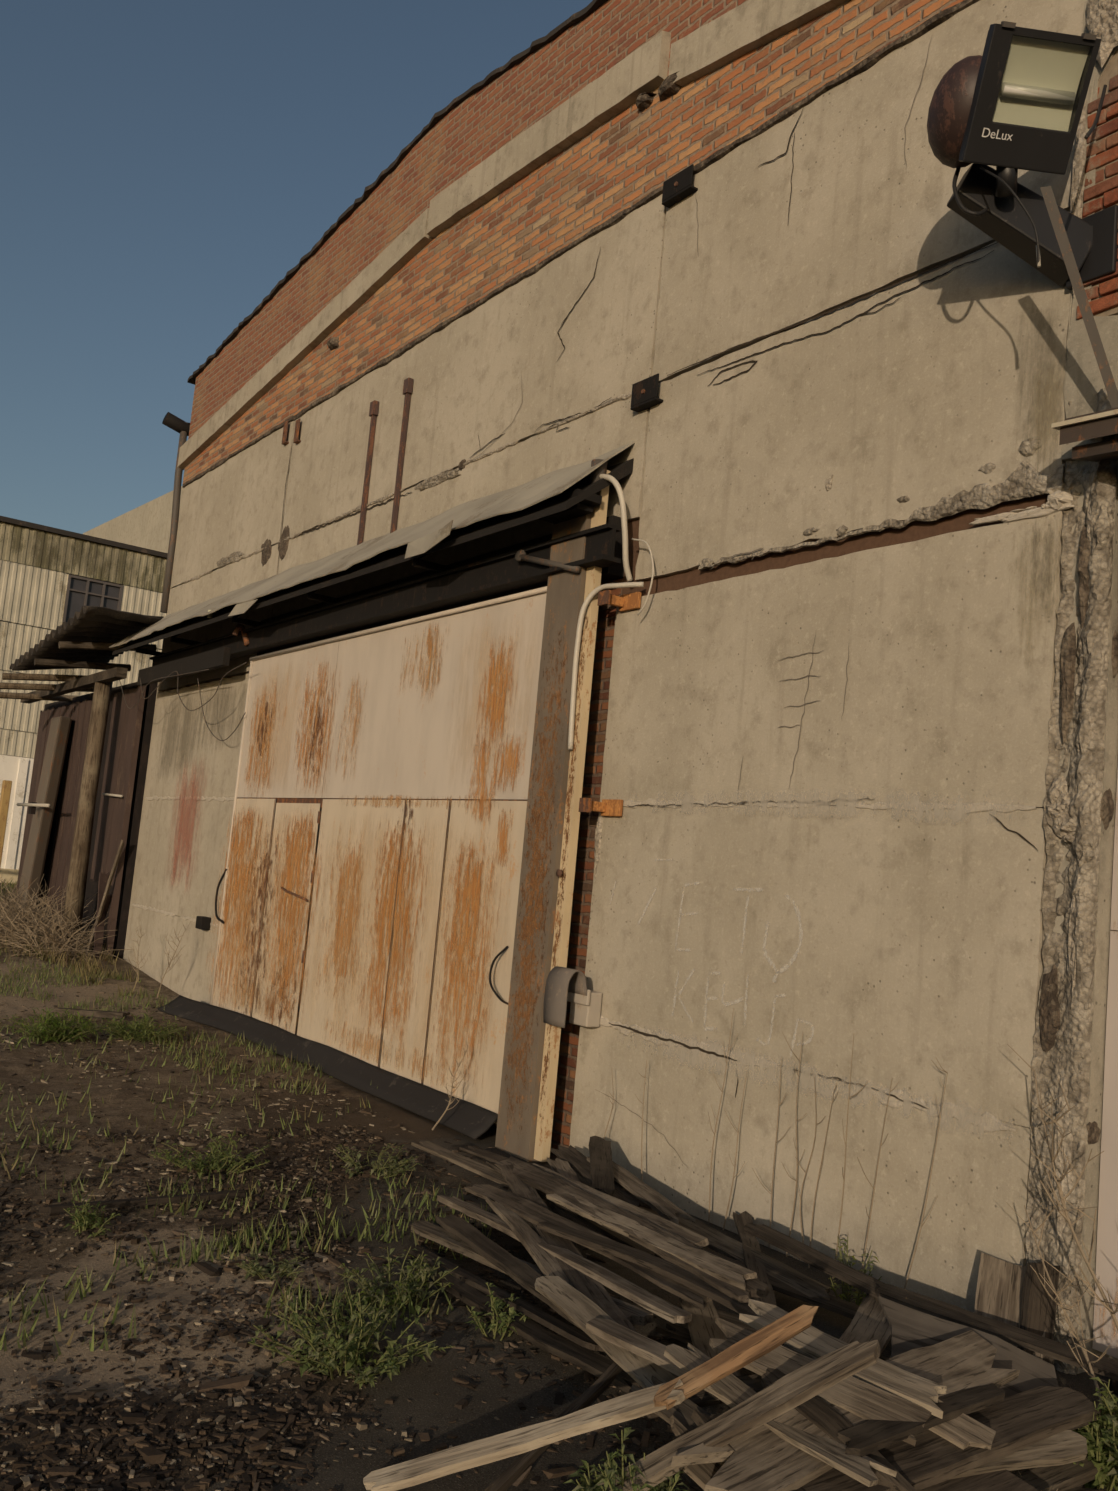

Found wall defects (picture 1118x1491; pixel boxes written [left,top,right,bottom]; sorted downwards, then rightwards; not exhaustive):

crack [667,242,998,386]
crack [464,377,610,466]
spalling [1091,434,1118,443]
spalling [1096,387,1118,412]
crack [277,447,412,572]
crack [627,635,874,807]
corrosion [209,605,589,1130]
spalling [698,438,1118,1375]
crack [990,814,1037,849]
crack [609,1023,738,1097]
crack [795,1070,930,1110]